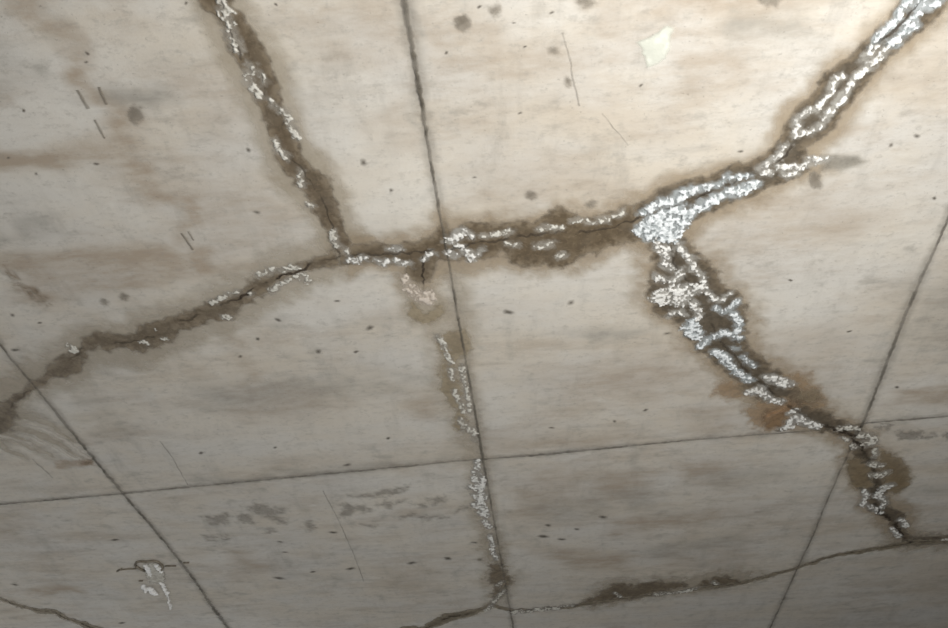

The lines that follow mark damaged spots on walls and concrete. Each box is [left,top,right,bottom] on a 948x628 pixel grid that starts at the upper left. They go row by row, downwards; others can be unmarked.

water stain [0,0,365,456]
crack [231,264,310,301]
water stain [339,0,948,544]
crack [825,425,865,454]
crack [0,598,100,628]
water stain [466,459,512,611]
crack [401,476,948,628]